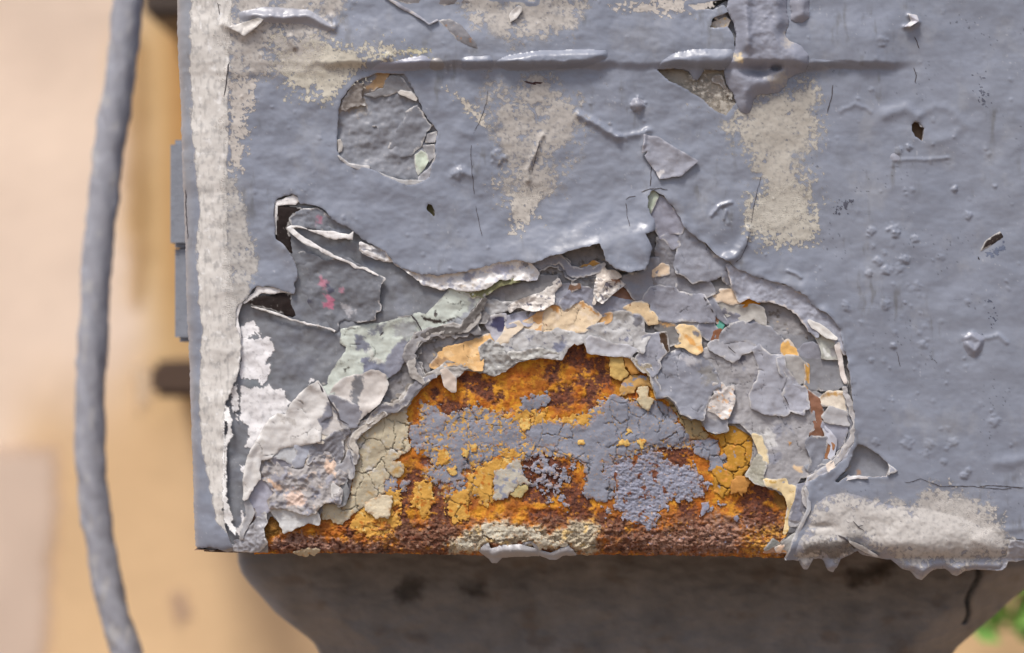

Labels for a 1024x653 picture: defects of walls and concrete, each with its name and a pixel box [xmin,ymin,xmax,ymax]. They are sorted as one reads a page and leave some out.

peeling [227,18,263,36]
rust [254,344,787,558]
peeling [222,134,898,554]